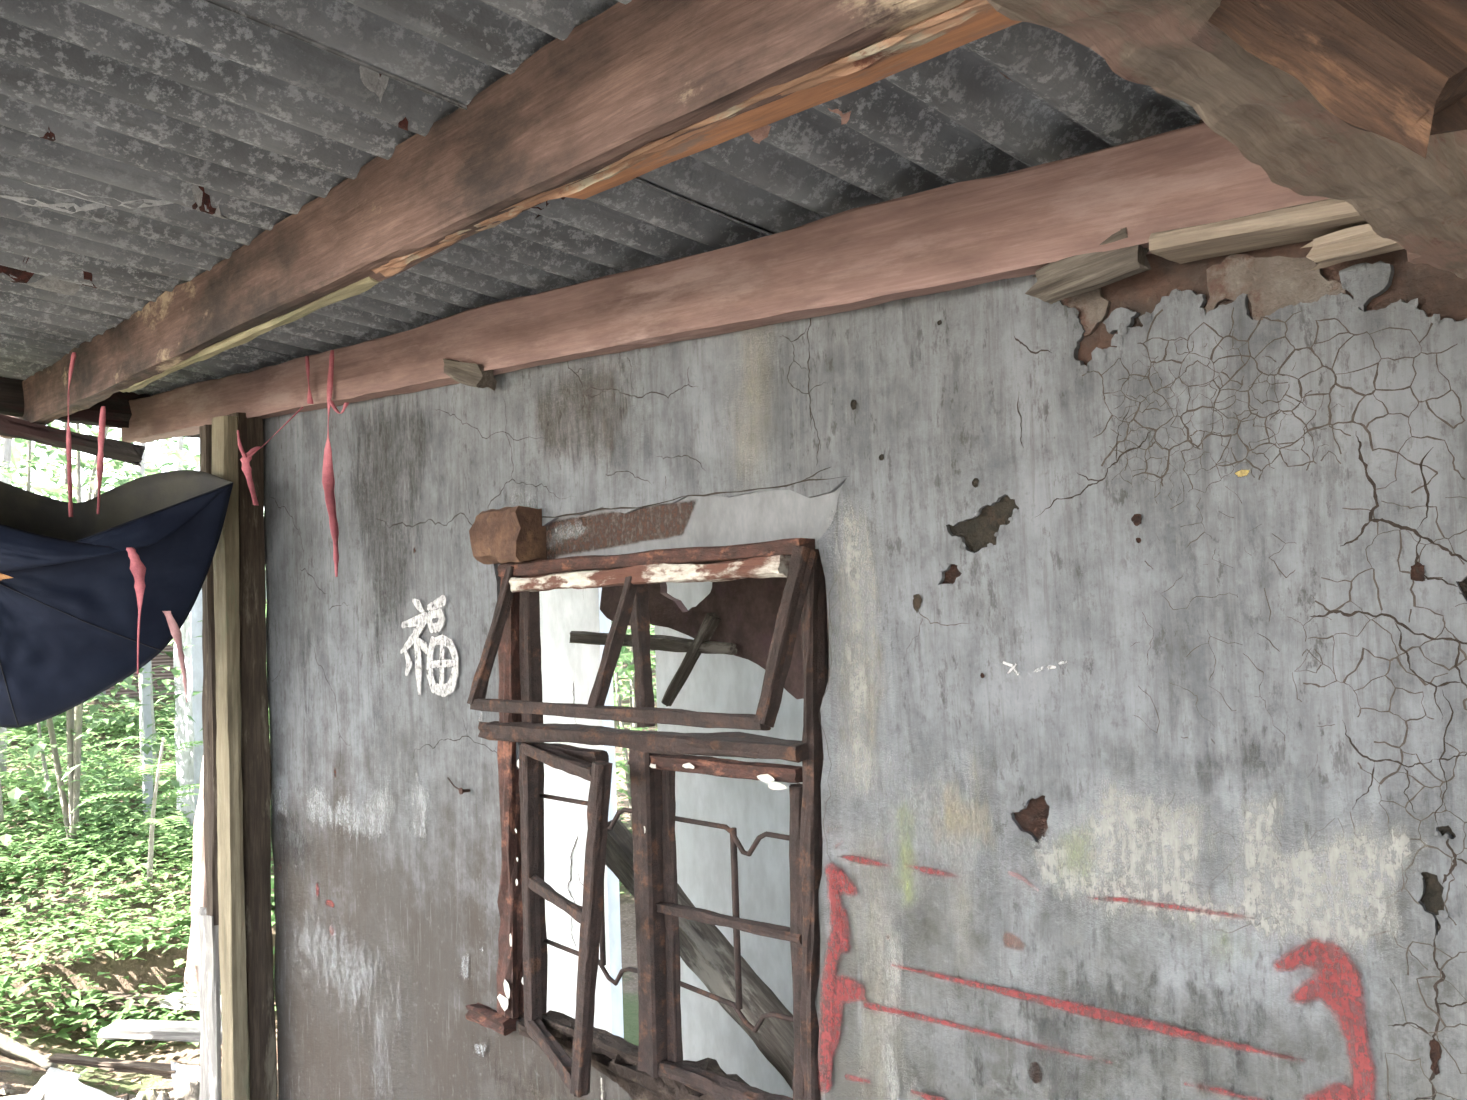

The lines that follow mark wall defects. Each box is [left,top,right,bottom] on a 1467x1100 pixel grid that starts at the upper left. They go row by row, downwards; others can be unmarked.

crack [1014,336,1052,354]
spalling [1061,240,1467,374]
spalling [938,495,1019,586]
crack [906,610,967,652]
spalling [1458,578,1467,598]
crack [1036,307,1467,1100]
peeling [1013,783,1448,954]
spalling [1434,825,1456,839]